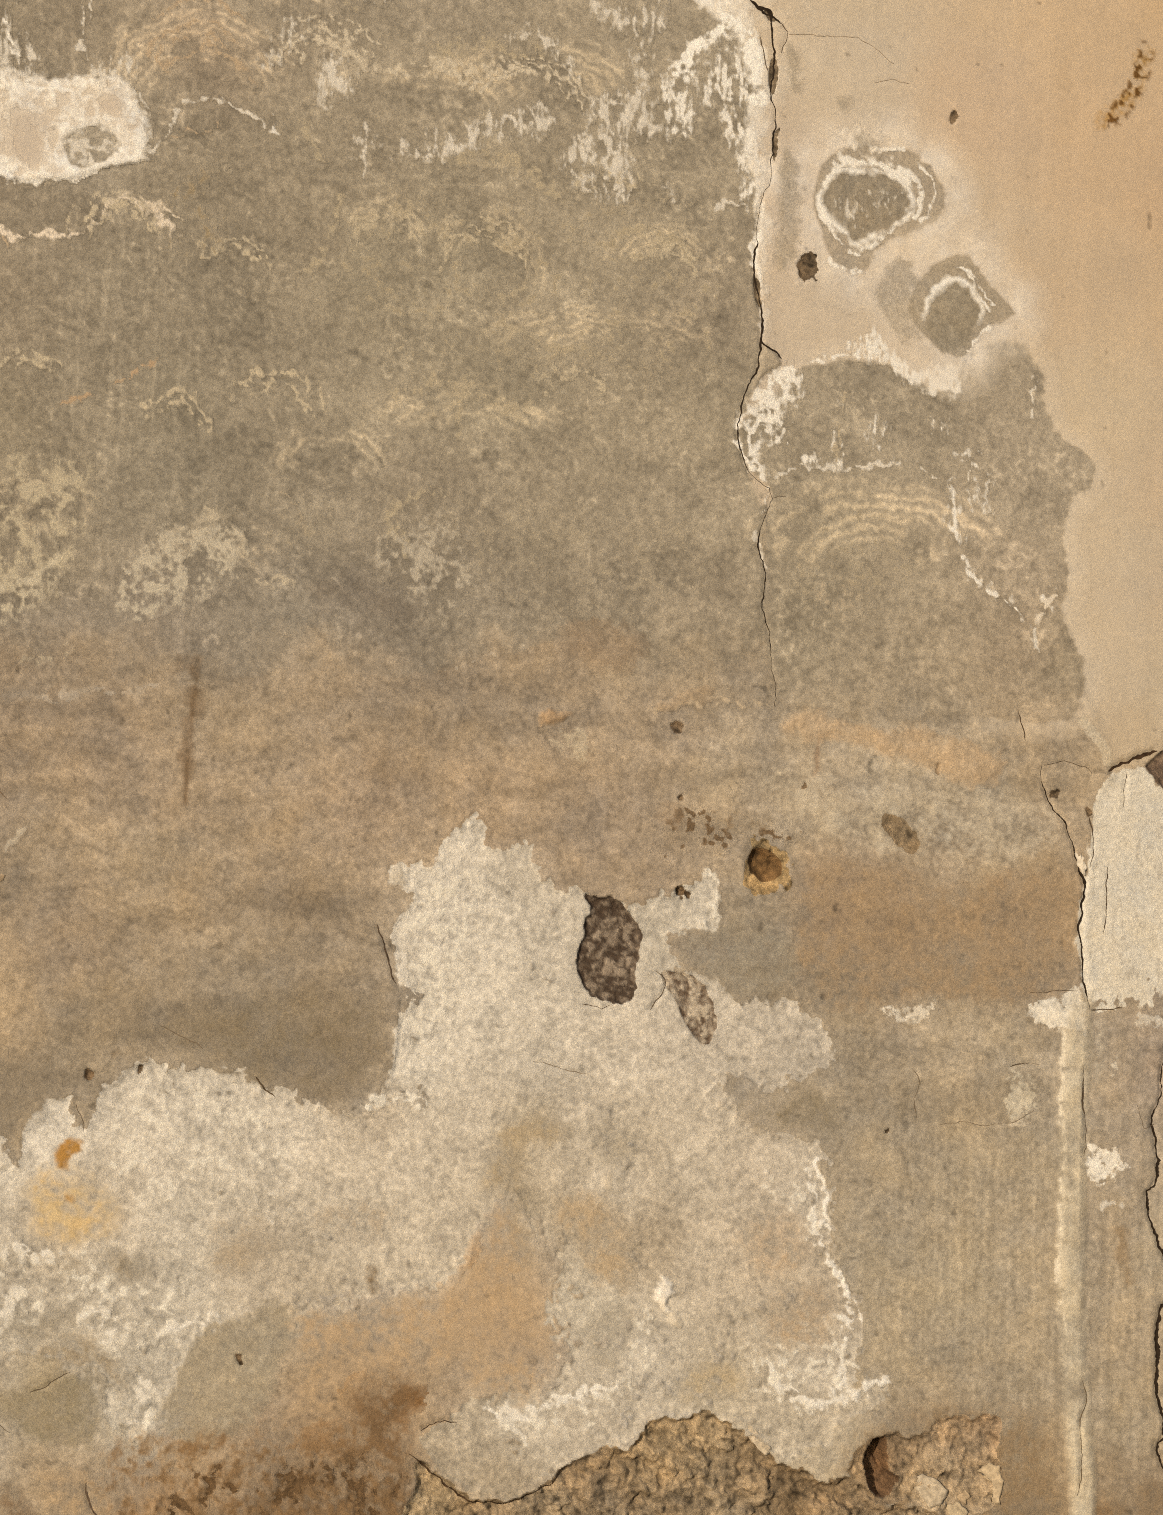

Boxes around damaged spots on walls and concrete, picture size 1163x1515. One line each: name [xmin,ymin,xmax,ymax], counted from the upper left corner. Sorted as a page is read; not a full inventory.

leakage [0,0,1114,808]
crack [737,0,909,706]
crack [1018,712,1157,1011]
flaking render [1075,765,1163,1015]
flaking render [0,810,1005,1515]
crack [1138,1063,1163,1256]
crack [1154,1303,1163,1469]